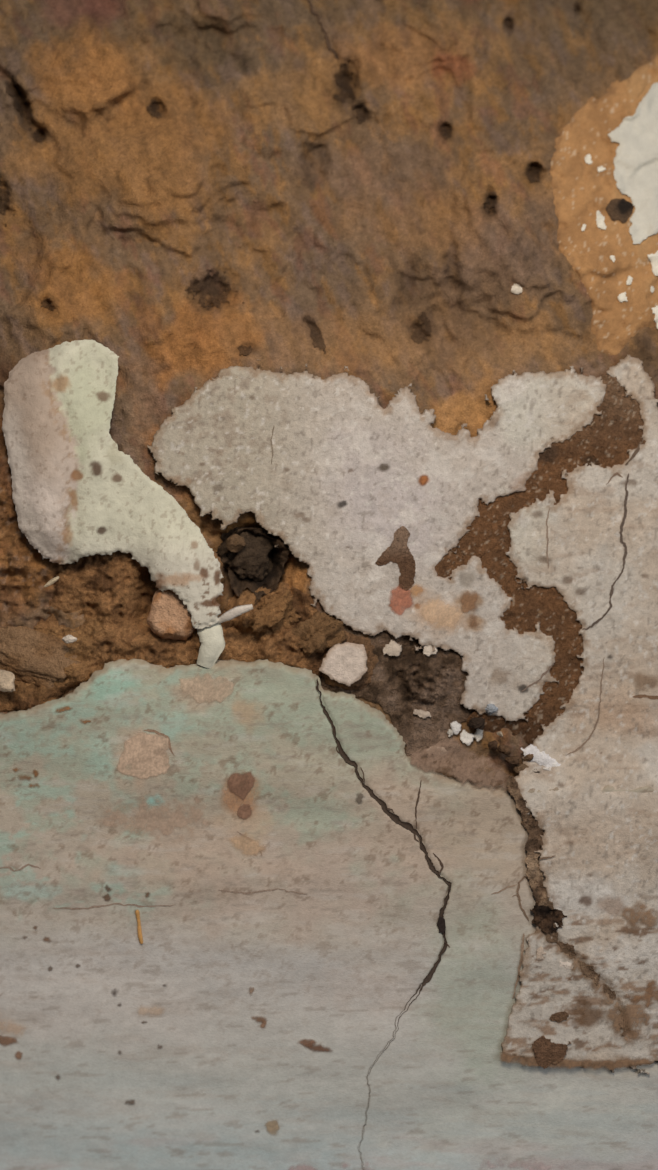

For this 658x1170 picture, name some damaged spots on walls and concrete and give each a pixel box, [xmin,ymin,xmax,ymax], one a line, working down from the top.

spalling [0,0,658,791]
crack [316,679,452,1170]